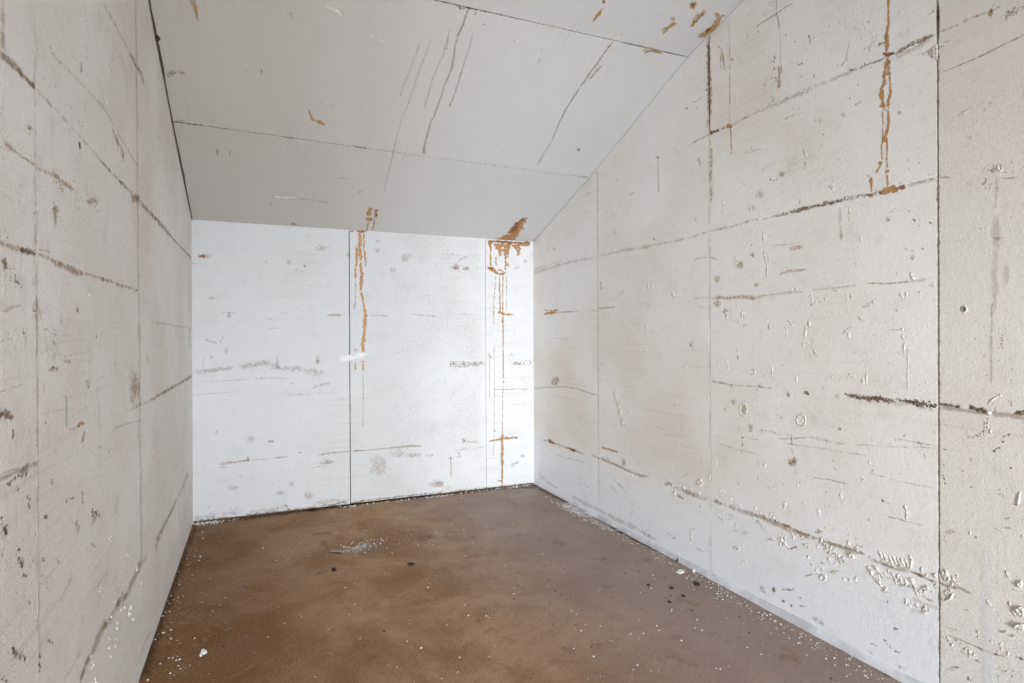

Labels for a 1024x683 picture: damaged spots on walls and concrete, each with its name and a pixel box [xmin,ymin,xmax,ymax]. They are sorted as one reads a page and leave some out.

corrosion [867,0,905,197]
corrosion [348,207,379,371]
corrosion [485,218,530,383]
corrosion [489,396,518,485]
peeling [665,459,974,614]